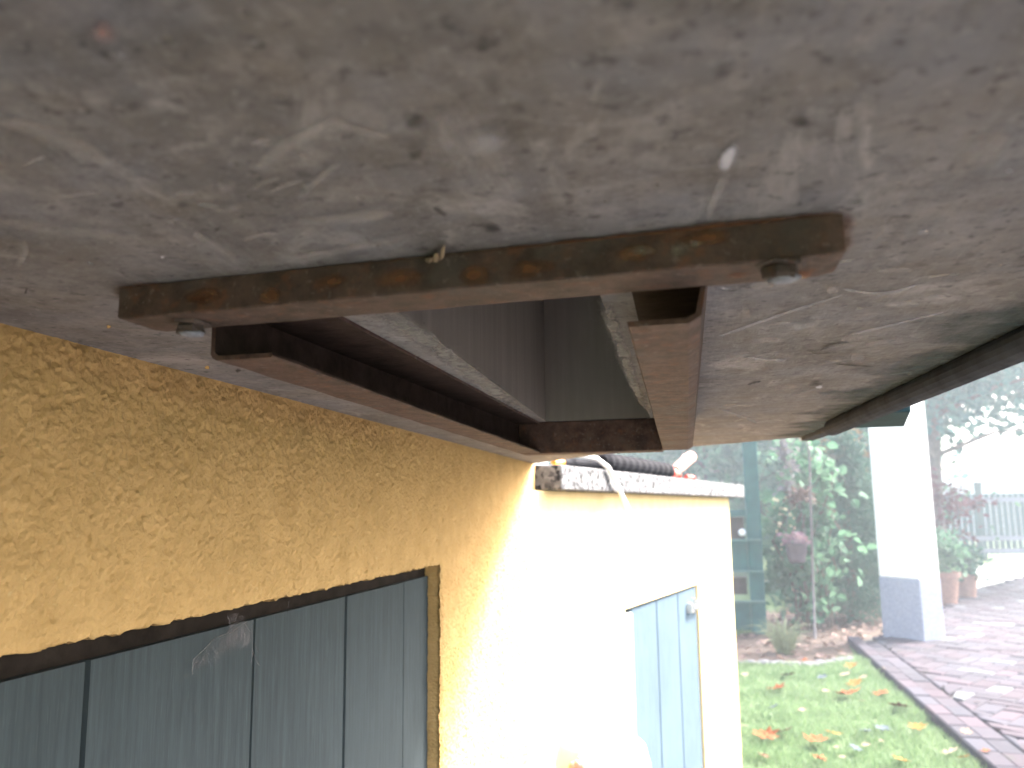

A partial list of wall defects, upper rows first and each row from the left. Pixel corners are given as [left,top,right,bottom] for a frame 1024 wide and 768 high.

corrosion [472,215,812,253]